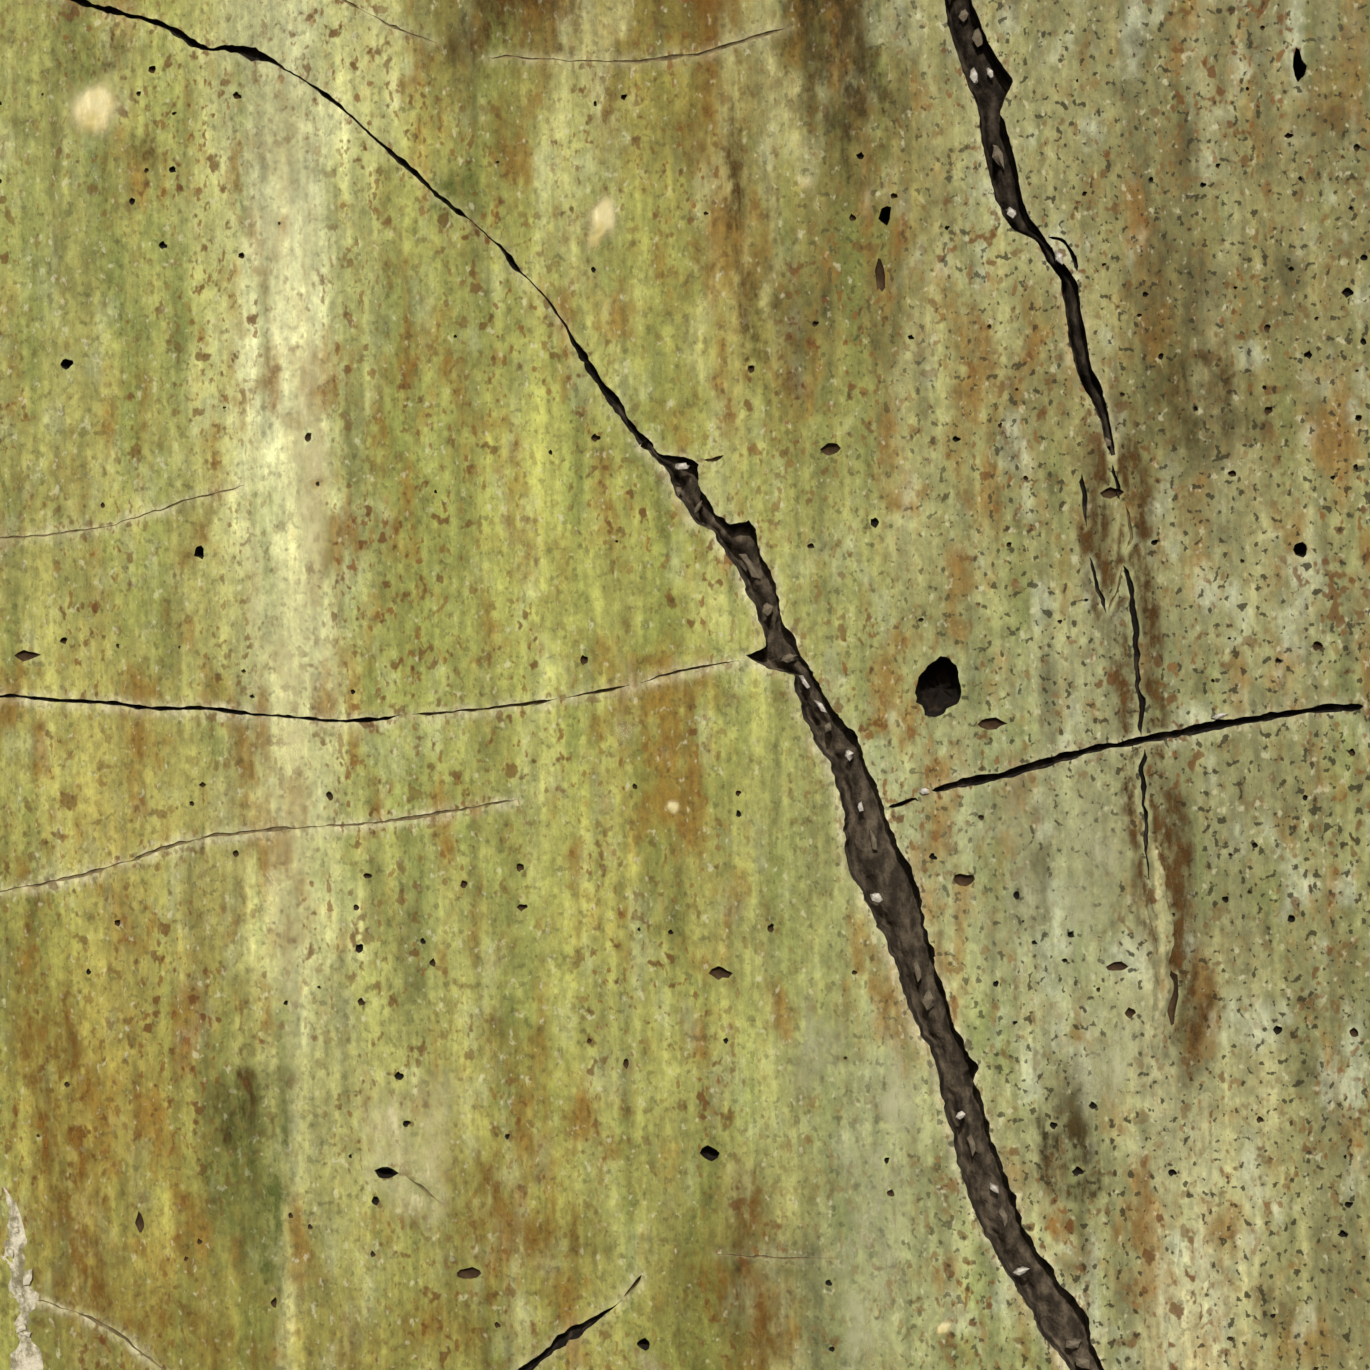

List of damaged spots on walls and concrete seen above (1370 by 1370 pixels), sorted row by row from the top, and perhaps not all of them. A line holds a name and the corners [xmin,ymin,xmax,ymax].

crack [945,0,1133,549]
crack [0,485,244,539]
crack [0,694,402,723]
crack [70,0,1104,1370]
crack [919,557,1370,794]
crack [1138,749,1149,878]
crack [37,1300,165,1370]